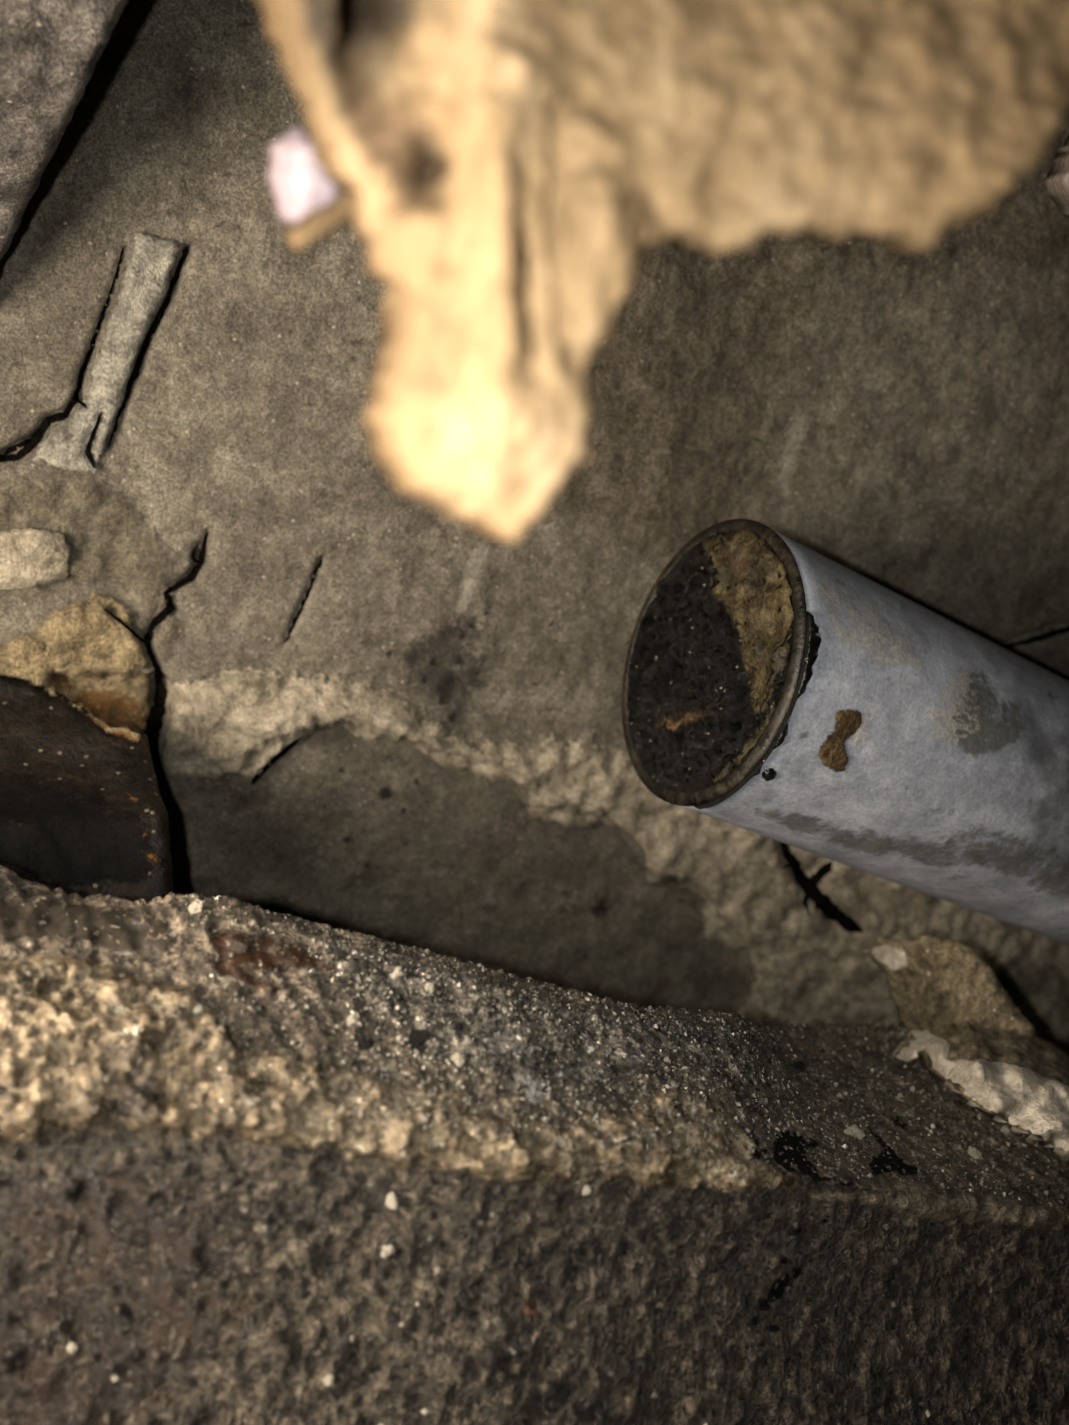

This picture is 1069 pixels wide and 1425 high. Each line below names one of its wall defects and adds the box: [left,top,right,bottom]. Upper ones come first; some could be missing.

crack [0,246,188,468]
crack [284,559,322,643]
crack [103,532,208,780]
corrosion [818,709,862,772]
crack [780,842,863,933]